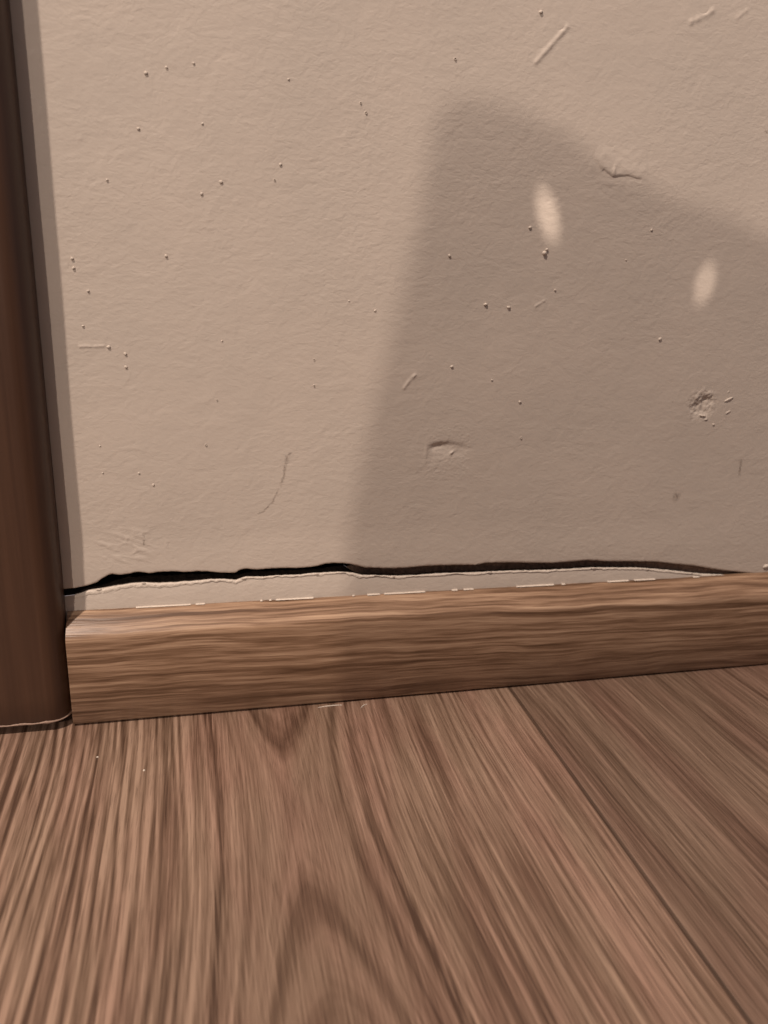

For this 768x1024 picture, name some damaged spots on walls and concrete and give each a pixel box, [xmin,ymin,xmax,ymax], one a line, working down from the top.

flaking render [672,372,733,436]
crack [64,560,745,599]